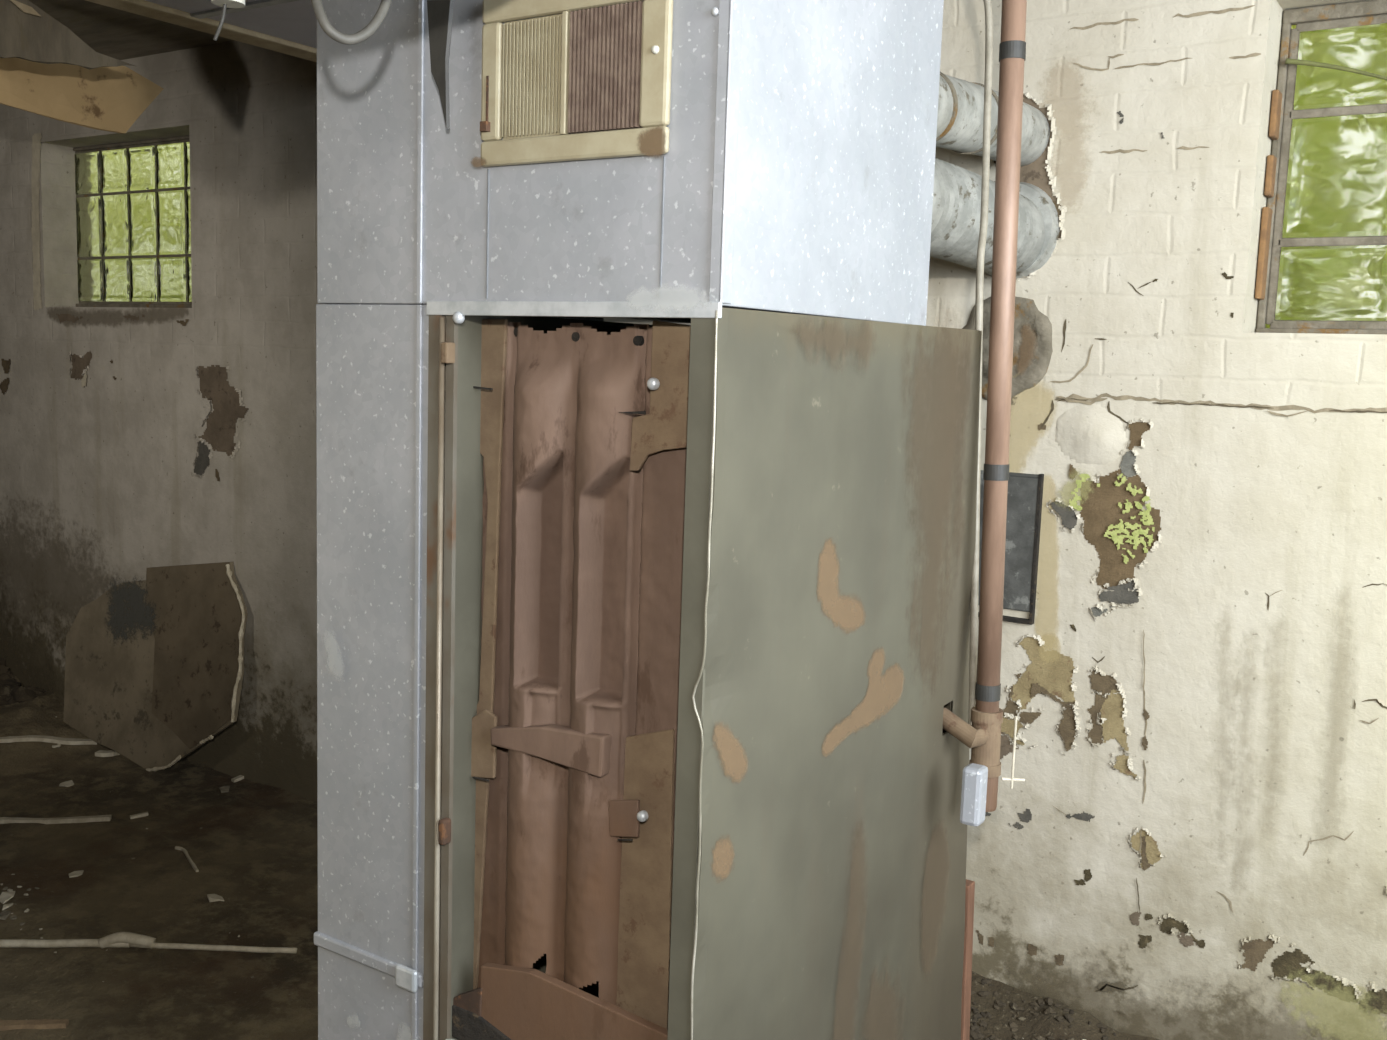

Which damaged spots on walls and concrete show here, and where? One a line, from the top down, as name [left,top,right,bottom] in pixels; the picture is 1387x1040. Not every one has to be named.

peeling [0,359,10,395]
peeling [68,351,92,387]
crack [1041,320,1387,428]
peeling [190,364,249,481]
peeling [1046,418,1162,621]
water stain [105,578,158,644]
peeling [1000,634,1141,781]
spalling [1126,826,1167,871]
spalling [1130,911,1205,949]
water stain [1096,982,1126,993]
peeling [1237,934,1387,1015]